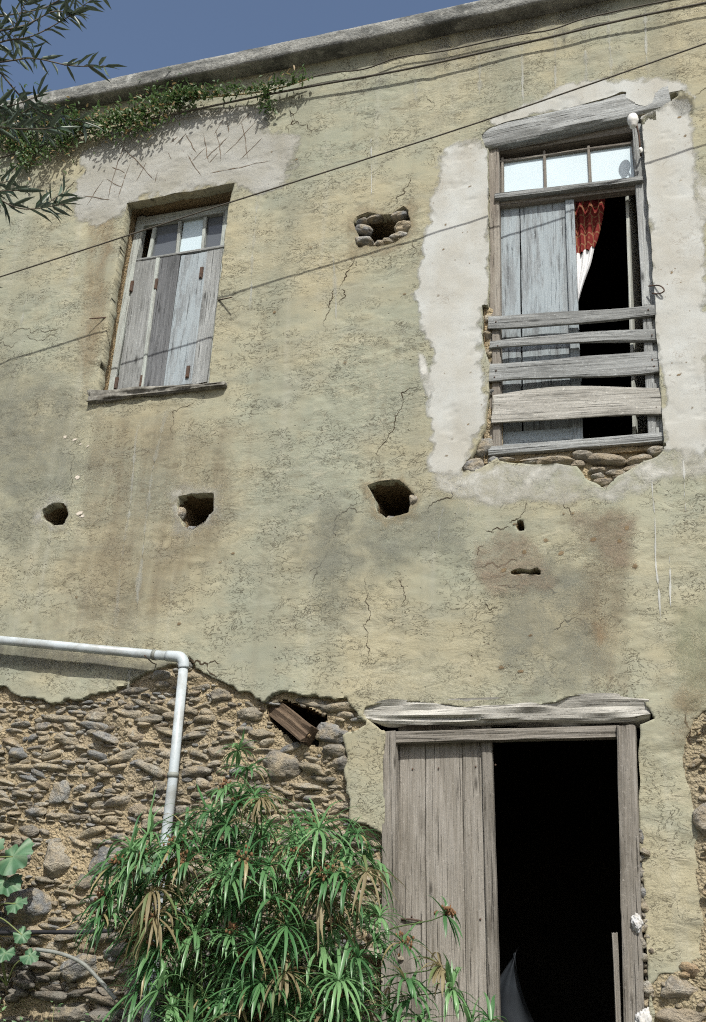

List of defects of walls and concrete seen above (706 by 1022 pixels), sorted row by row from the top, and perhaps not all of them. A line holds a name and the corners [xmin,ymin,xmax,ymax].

crack [323,252,357,330]
peeling [348,77,706,504]
crack [377,384,422,456]
spalling [171,488,215,530]
spalling [365,479,418,524]
flaking render [0,660,382,1022]
flaking render [644,711,706,1022]